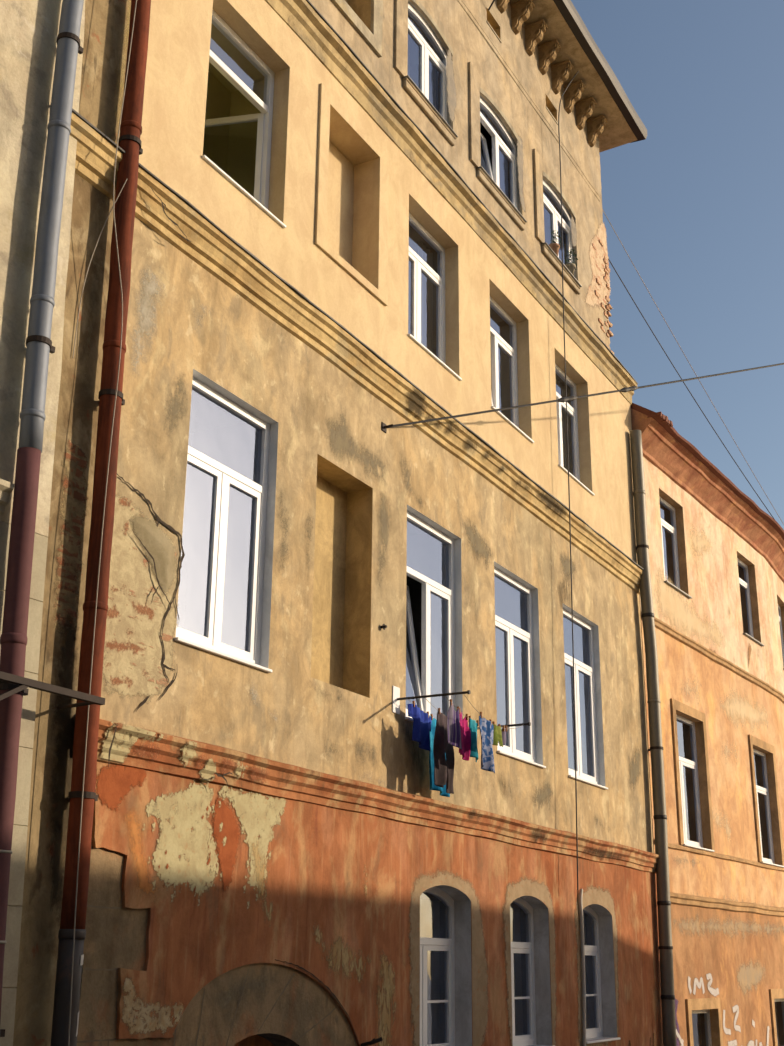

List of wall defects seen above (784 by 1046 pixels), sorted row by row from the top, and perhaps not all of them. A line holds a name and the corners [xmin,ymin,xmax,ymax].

flaking render [585,221,614,354]
flaking render [54,440,88,634]
flaking render [103,494,179,702]
crack [117,474,185,711]
crack [108,727,117,767]
spalling [98,721,167,765]
peeling [142,741,288,921]
peeling [122,978,183,1034]
peeling [315,927,396,1046]